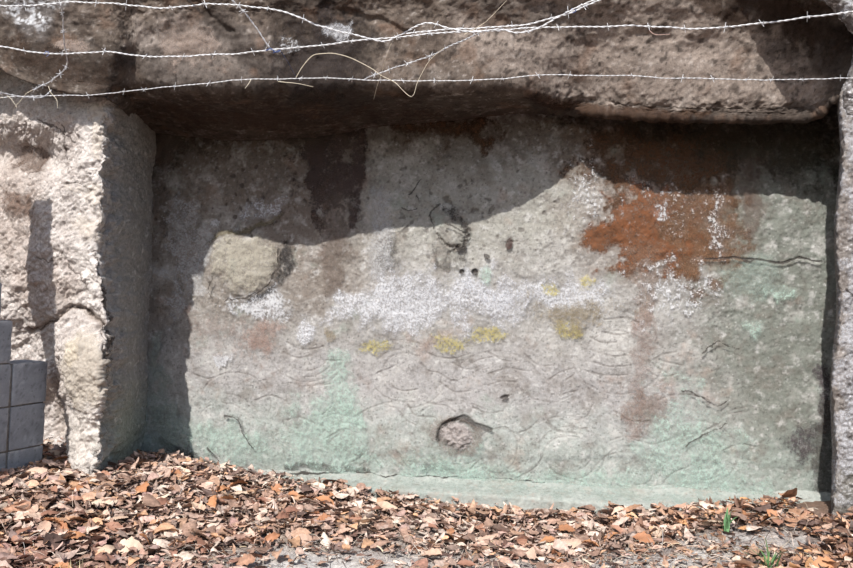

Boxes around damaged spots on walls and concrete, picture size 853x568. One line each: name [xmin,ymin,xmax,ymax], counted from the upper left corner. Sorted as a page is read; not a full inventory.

water stain [285,128,368,231]
corrosion [525,93,763,303]
crack [705,256,822,264]
spalling [436,415,492,450]